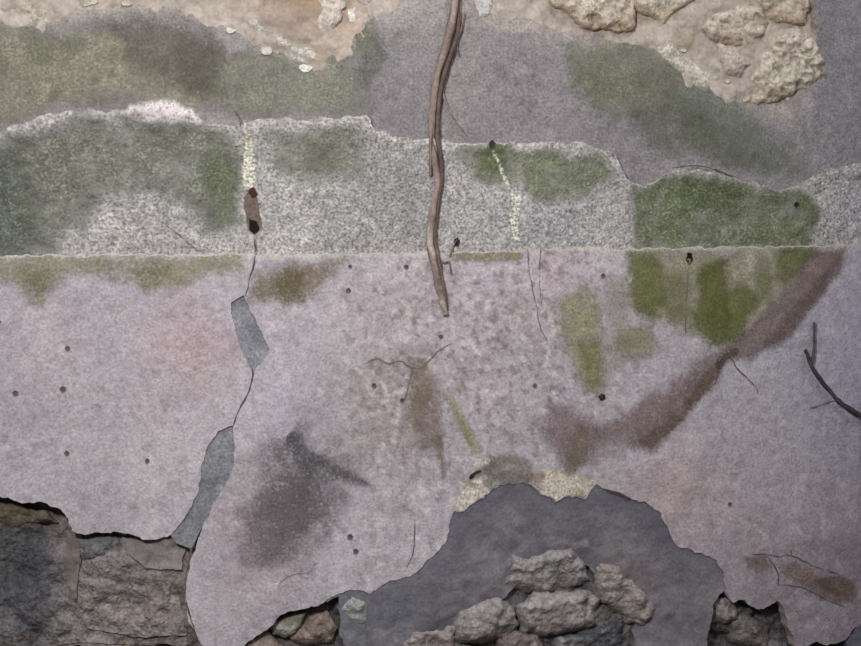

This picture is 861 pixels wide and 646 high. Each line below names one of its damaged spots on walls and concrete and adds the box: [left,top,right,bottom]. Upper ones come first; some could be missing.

leakage [226,19,316,73]
efflorescence [124,100,202,124]
efflorescence [242,132,257,190]
leakage [609,250,769,344]
leakage [777,247,809,281]
crack [171,187,269,644]
leakage [253,432,368,561]
flaking render [0,497,203,646]
flaking render [326,455,730,646]
crack [753,550,847,608]